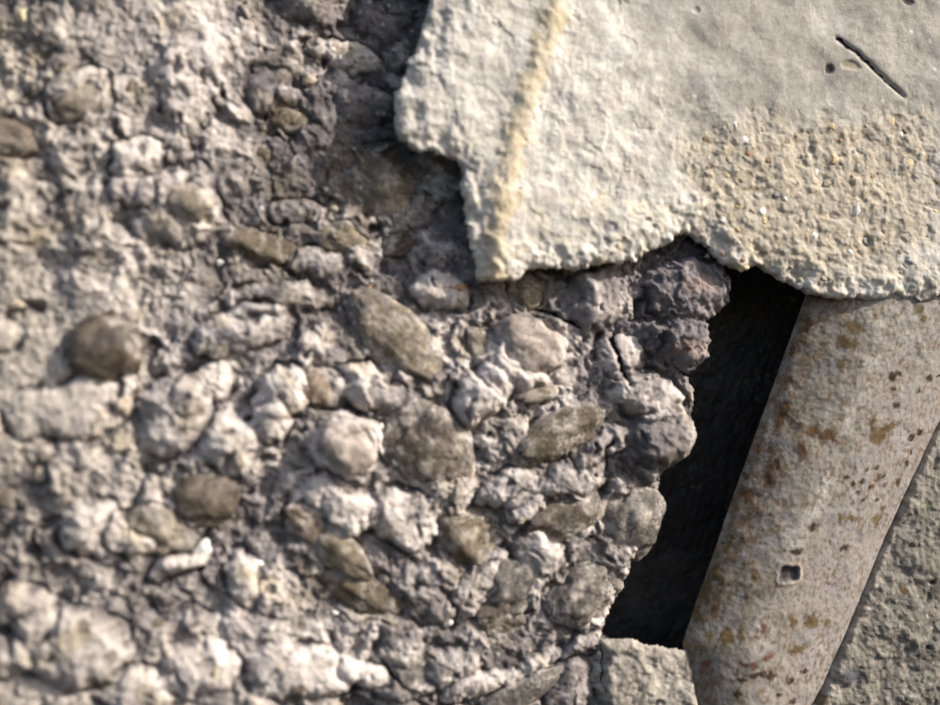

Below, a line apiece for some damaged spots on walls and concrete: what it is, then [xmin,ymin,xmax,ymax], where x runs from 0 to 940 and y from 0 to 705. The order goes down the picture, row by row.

crack [836,37,902,95]
flaking render [826,123,861,165]
flaking render [734,204,767,224]
flaking render [772,191,803,202]
flaking render [850,166,877,216]
spalling [0,0,697,705]
rust [889,371,902,408]
rust [797,422,841,460]
rust [870,418,895,444]
rust [845,465,900,529]
rust [733,654,777,700]
rust [814,691,829,705]